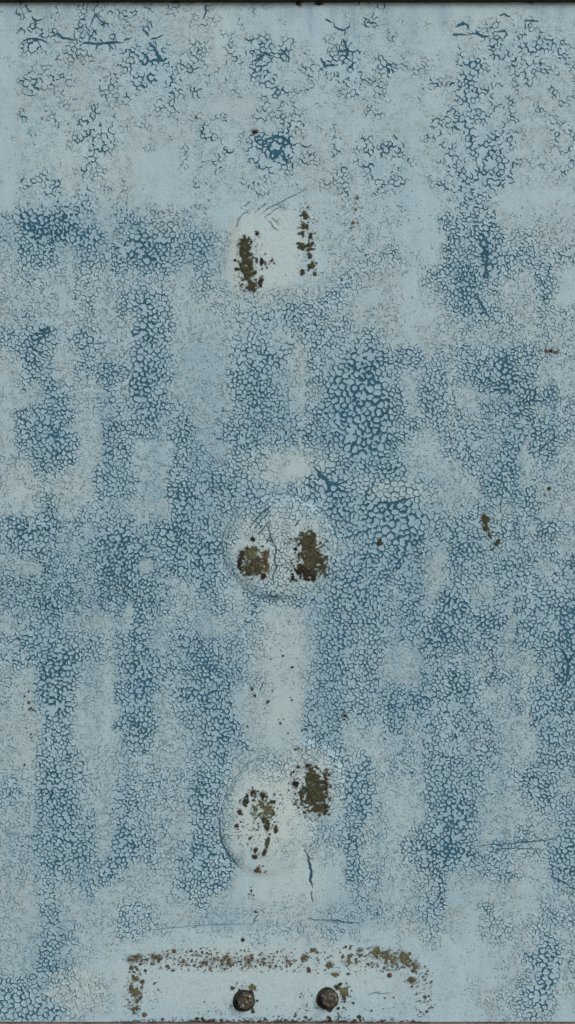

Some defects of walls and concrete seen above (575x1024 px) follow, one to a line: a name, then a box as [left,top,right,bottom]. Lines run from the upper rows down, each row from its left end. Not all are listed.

crack [185,2,244,69]
crack [362,2,398,42]
crack [16,108,37,145]
crack [179,112,236,201]
crack [239,18,439,205]
crack [548,84,575,107]
rust [234,231,275,292]
rust [296,206,319,276]
rust [237,537,269,580]
rust [284,530,330,585]
rust [235,745,332,873]
rust [116,938,436,1022]